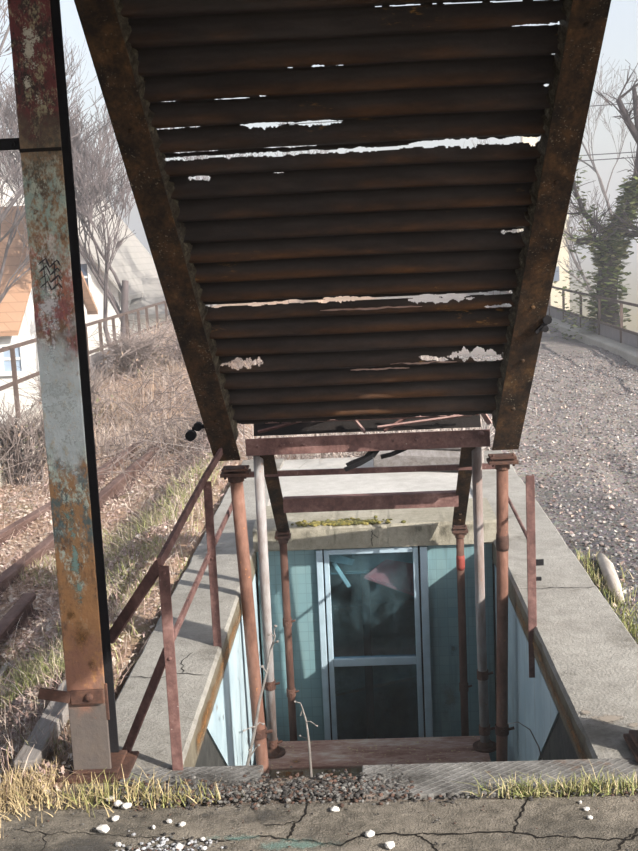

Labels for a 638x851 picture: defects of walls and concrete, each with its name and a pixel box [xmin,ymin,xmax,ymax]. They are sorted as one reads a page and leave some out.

peeling [20,23,43,104]
rust [197,612,241,749]
crack [12,799,638,851]